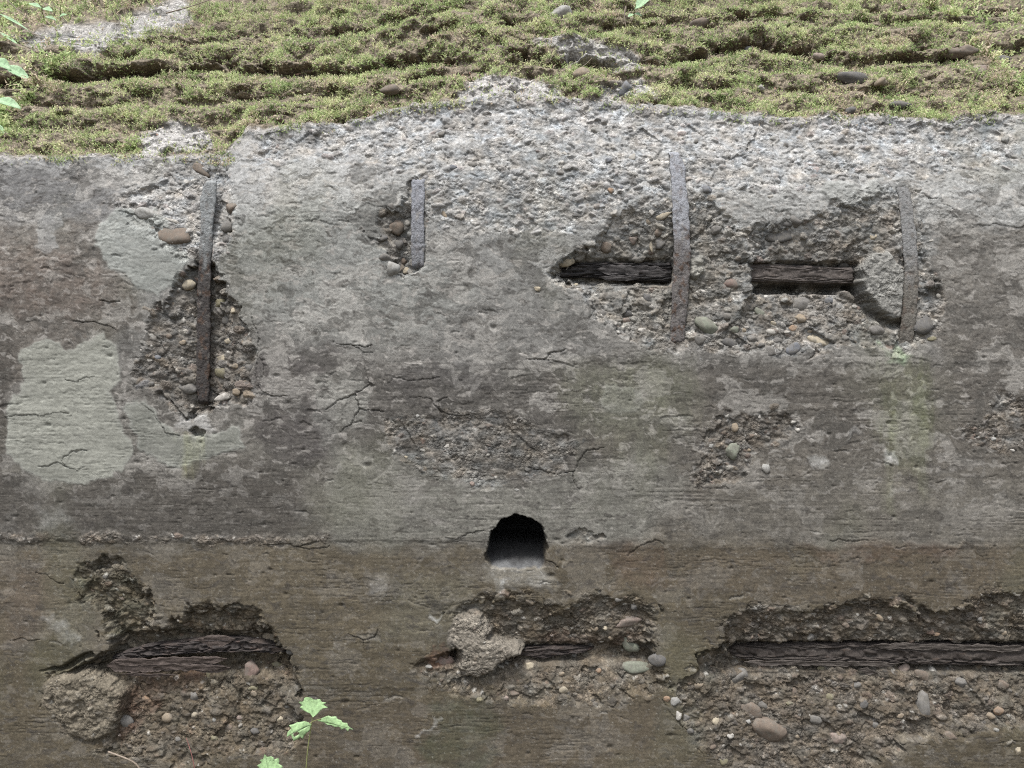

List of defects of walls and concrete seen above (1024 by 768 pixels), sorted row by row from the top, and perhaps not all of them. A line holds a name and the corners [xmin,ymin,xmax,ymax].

peeling [5,160,262,485]
crack [335,343,385,433]
spalling [360,174,435,282]
crack [528,449,595,490]
spalling [534,182,949,365]
spalling [38,600,313,768]
spalling [410,581,1024,768]